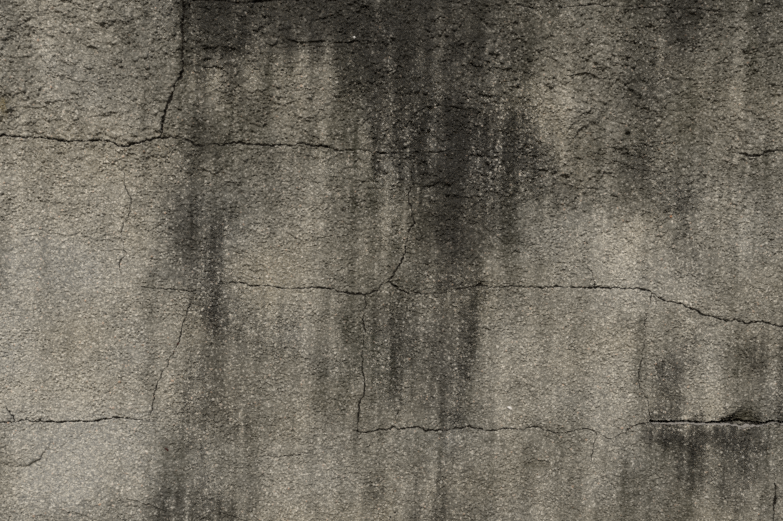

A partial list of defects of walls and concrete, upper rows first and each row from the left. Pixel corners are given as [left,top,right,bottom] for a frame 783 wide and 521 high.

crack [517,3,744,14]
crack [0,0,466,154]
leakage [178,0,504,292]
crack [735,149,783,157]
crack [119,173,132,272]
crack [0,287,200,423]
crack [219,166,783,473]
leakage [649,411,764,458]
crack [771,473,779,521]